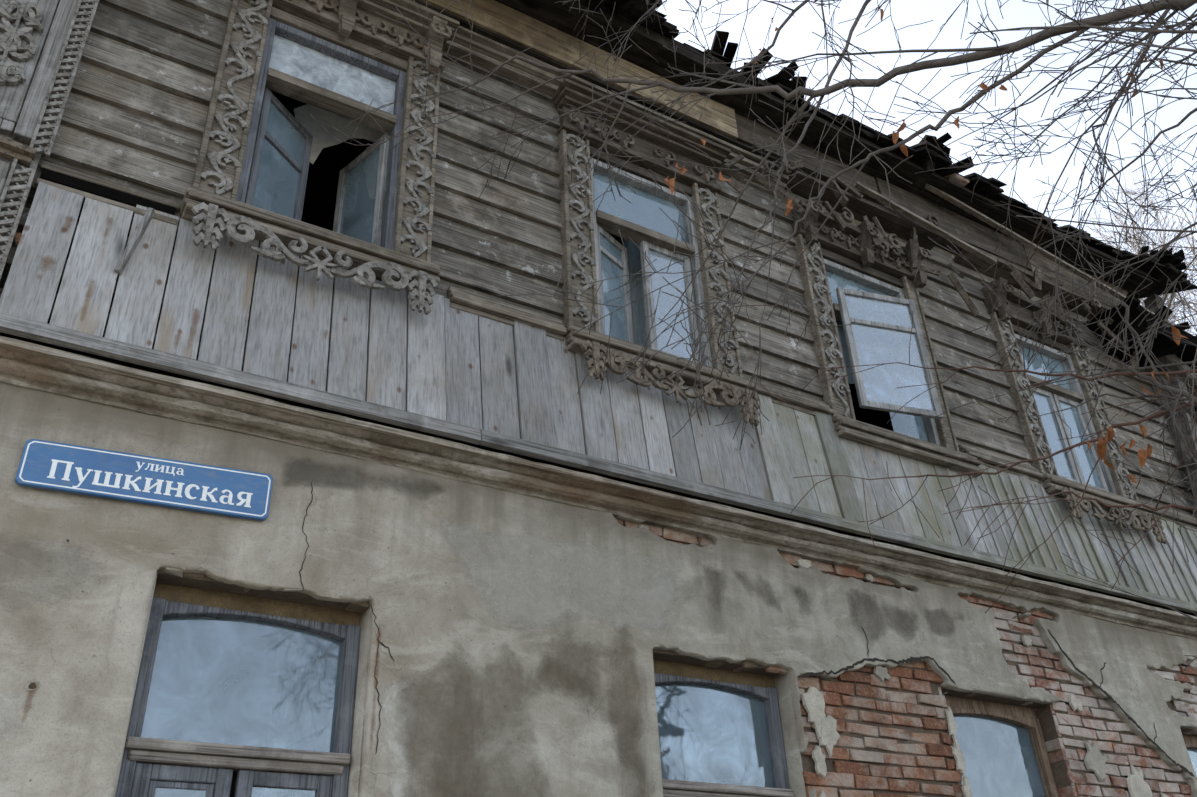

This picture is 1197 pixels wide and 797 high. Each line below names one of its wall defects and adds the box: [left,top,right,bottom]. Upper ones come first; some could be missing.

crack [299,482,313,592]
flaking render [779,552,911,590]
crack [371,606,394,754]
water stain [383,644,595,797]
flaking render [765,661,972,797]
flaking render [958,595,1197,797]